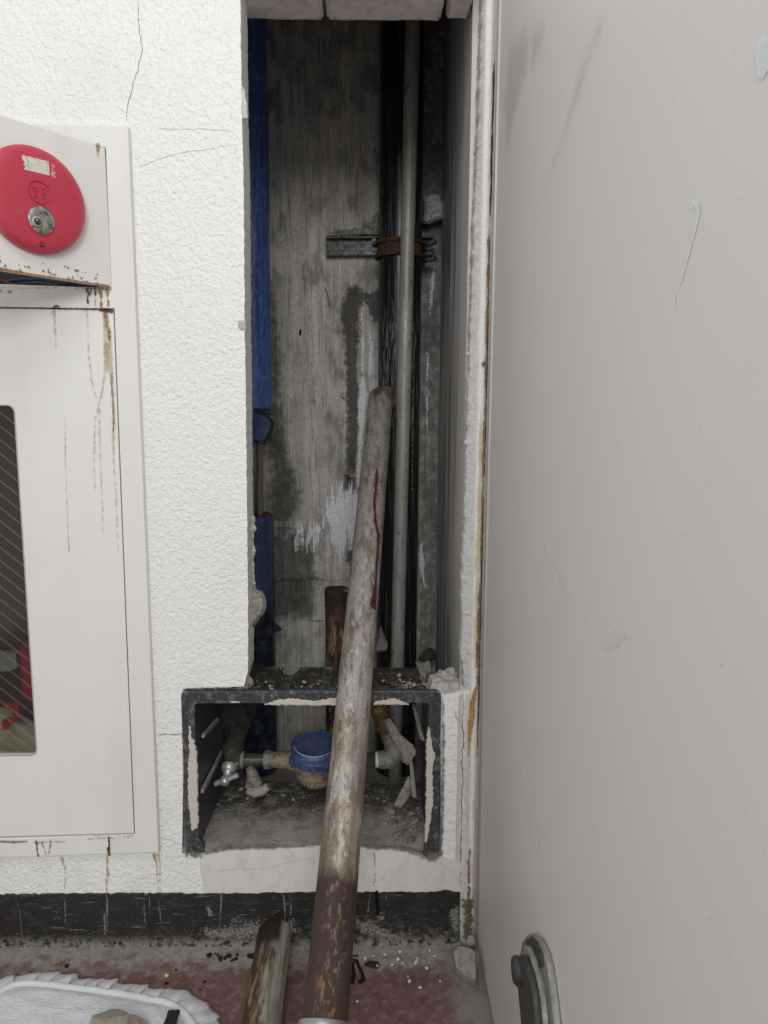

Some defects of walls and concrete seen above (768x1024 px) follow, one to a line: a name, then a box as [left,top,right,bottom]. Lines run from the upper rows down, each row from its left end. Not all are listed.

crack [126,0,143,122]
crack [139,128,237,167]
rust [482,236,490,388]
damp [271,287,379,617]
rust [466,412,485,824]
rust [0,840,64,865]
rust [461,849,475,940]